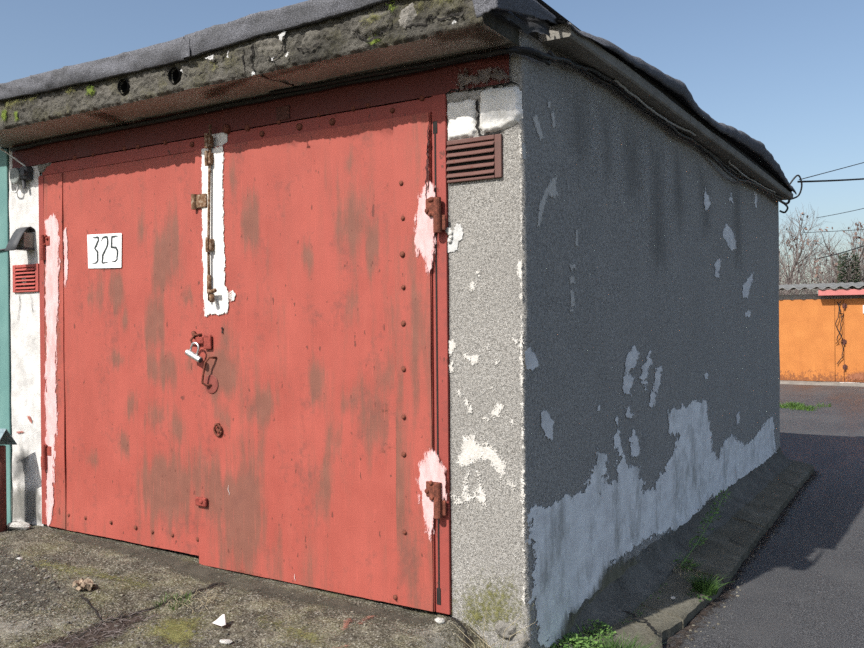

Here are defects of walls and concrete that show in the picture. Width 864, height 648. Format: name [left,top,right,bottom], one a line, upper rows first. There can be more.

crack [241,41,319,87]
spalling [445,66,544,180]
peeling [537,176,559,228]
peeling [723,224,737,251]
peeling [742,271,754,299]
peeling [448,338,491,373]
spalling [482,314,539,451]
peeling [451,345,777,648]